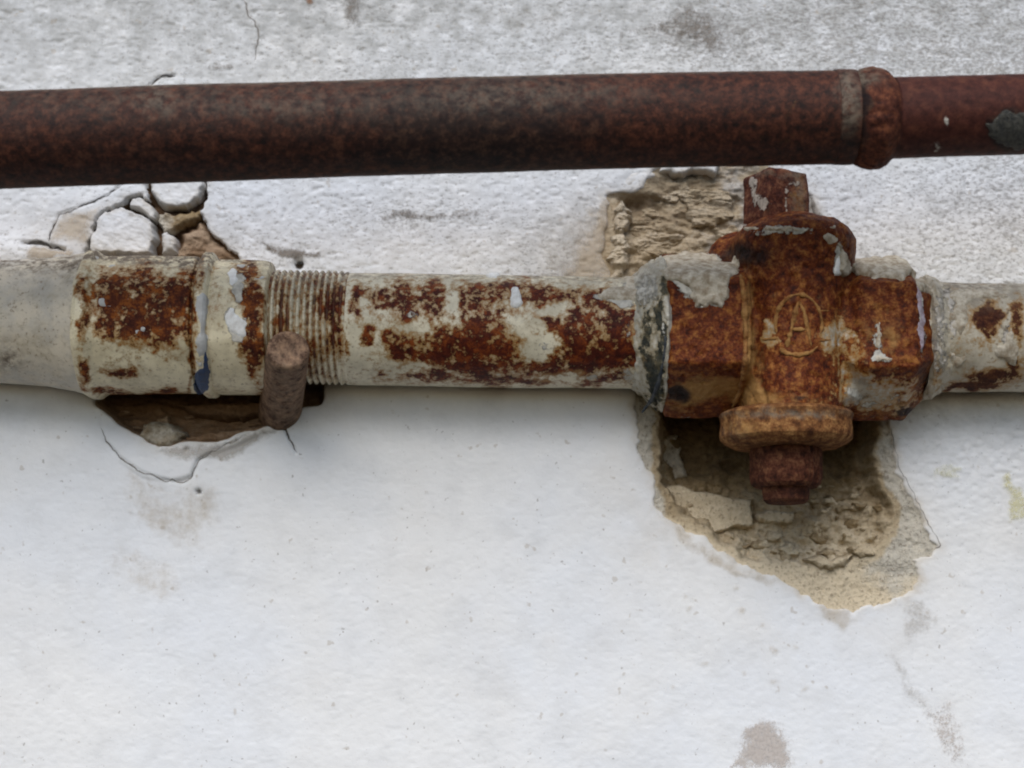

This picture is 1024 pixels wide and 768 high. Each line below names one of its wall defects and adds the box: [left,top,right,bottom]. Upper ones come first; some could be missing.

crack [24,182,240,260]
spalling [601,166,768,277]
crack [102,431,241,483]
spalling [95,394,266,458]
spalling [302,381,325,408]
spalling [634,336,941,613]